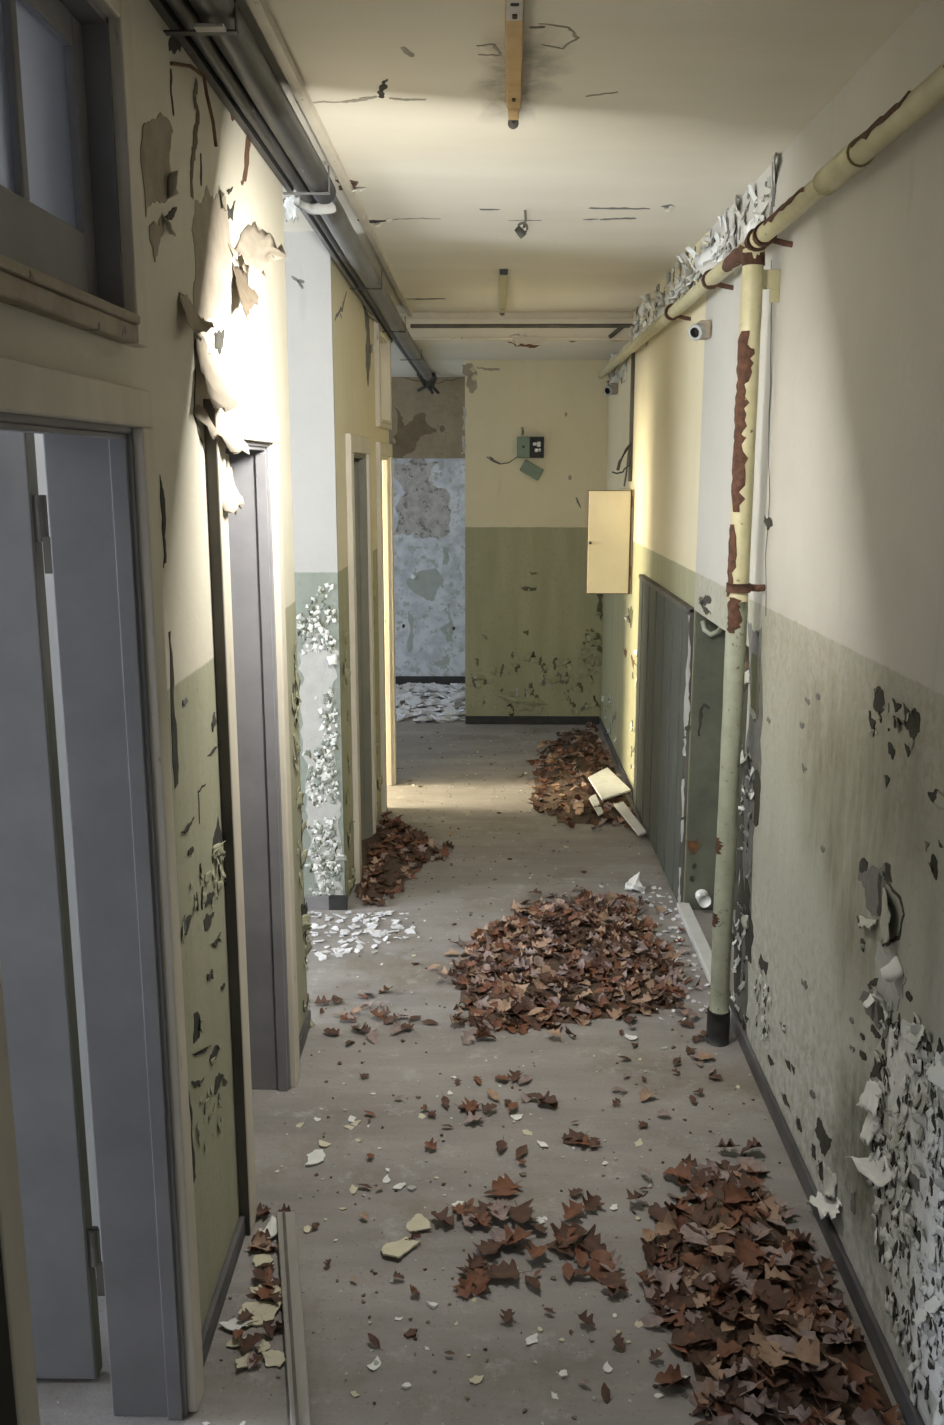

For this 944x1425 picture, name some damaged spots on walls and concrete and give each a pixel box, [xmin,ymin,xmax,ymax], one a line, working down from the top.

peeling [682,595,712,757]
peeling [678,863,696,903]
spalling [729,621,795,1075]
spalling [925,840,943,880]
peeling [782,858,944,1425]